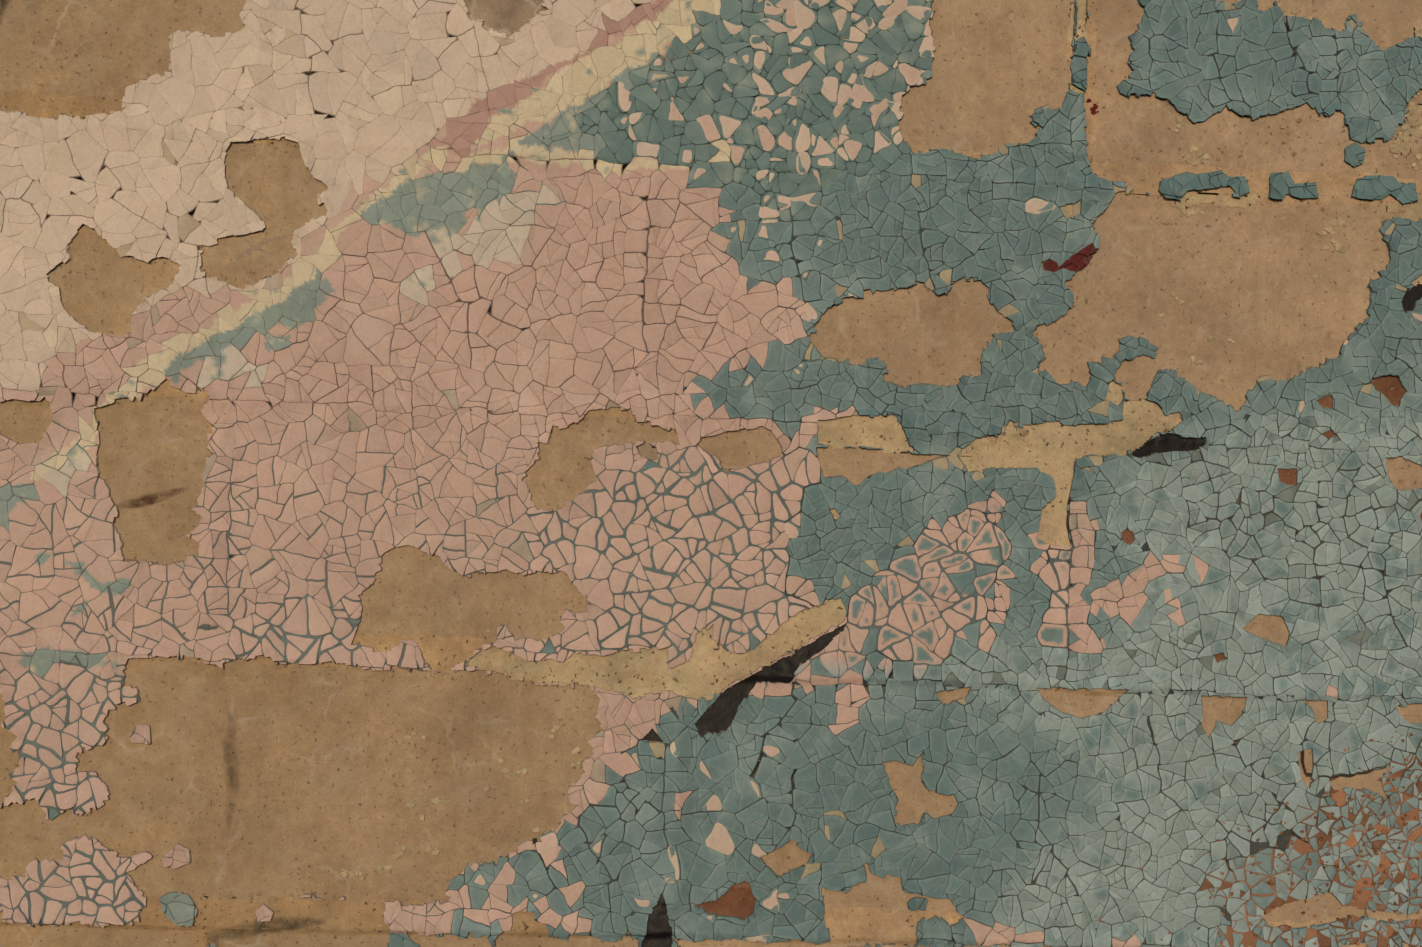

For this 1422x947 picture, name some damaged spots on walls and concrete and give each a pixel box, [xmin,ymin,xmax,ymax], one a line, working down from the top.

crack [1065,492,1073,676]
peeling [319,645,351,665]
peeling [1237,739,1252,765]
crack [1301,739,1386,778]
crack [1233,743,1308,844]
peeling [1410,770,1422,799]
peeling [1251,805,1307,847]
peeling [1295,806,1320,850]
peeling [1316,810,1334,835]
peeling [1226,832,1273,886]
peeling [558,881,585,907]
peeling [1185,908,1231,947]